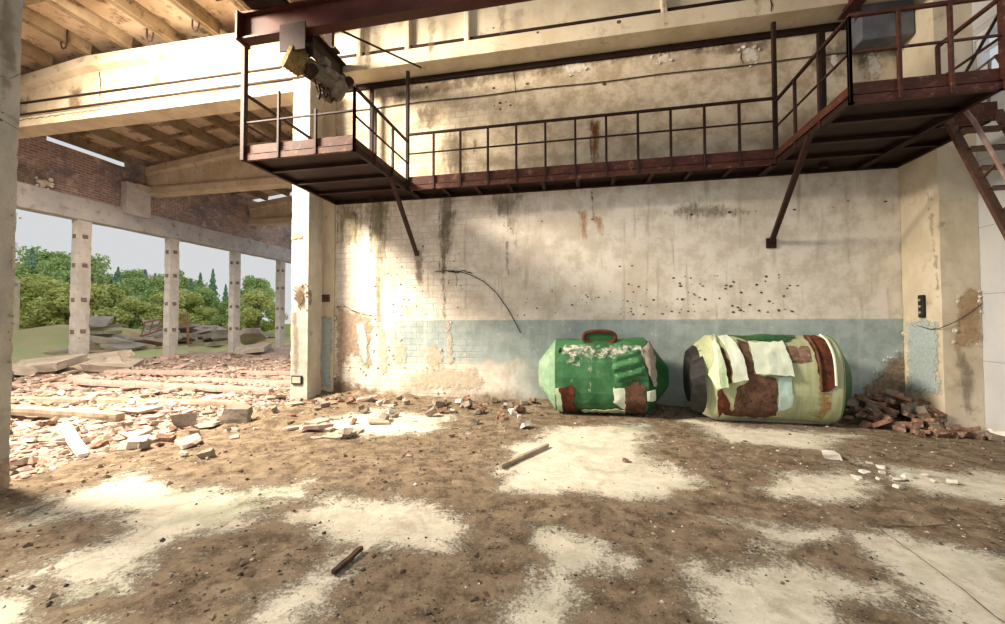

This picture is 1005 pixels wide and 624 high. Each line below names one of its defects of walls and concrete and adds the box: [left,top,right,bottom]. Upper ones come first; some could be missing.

leakage [337,202,389,321]
leakage [441,198,454,268]
peeling [320,300,484,394]
peeling [852,319,941,414]
spalling [952,288,983,347]
crack [815,442,1005,623]